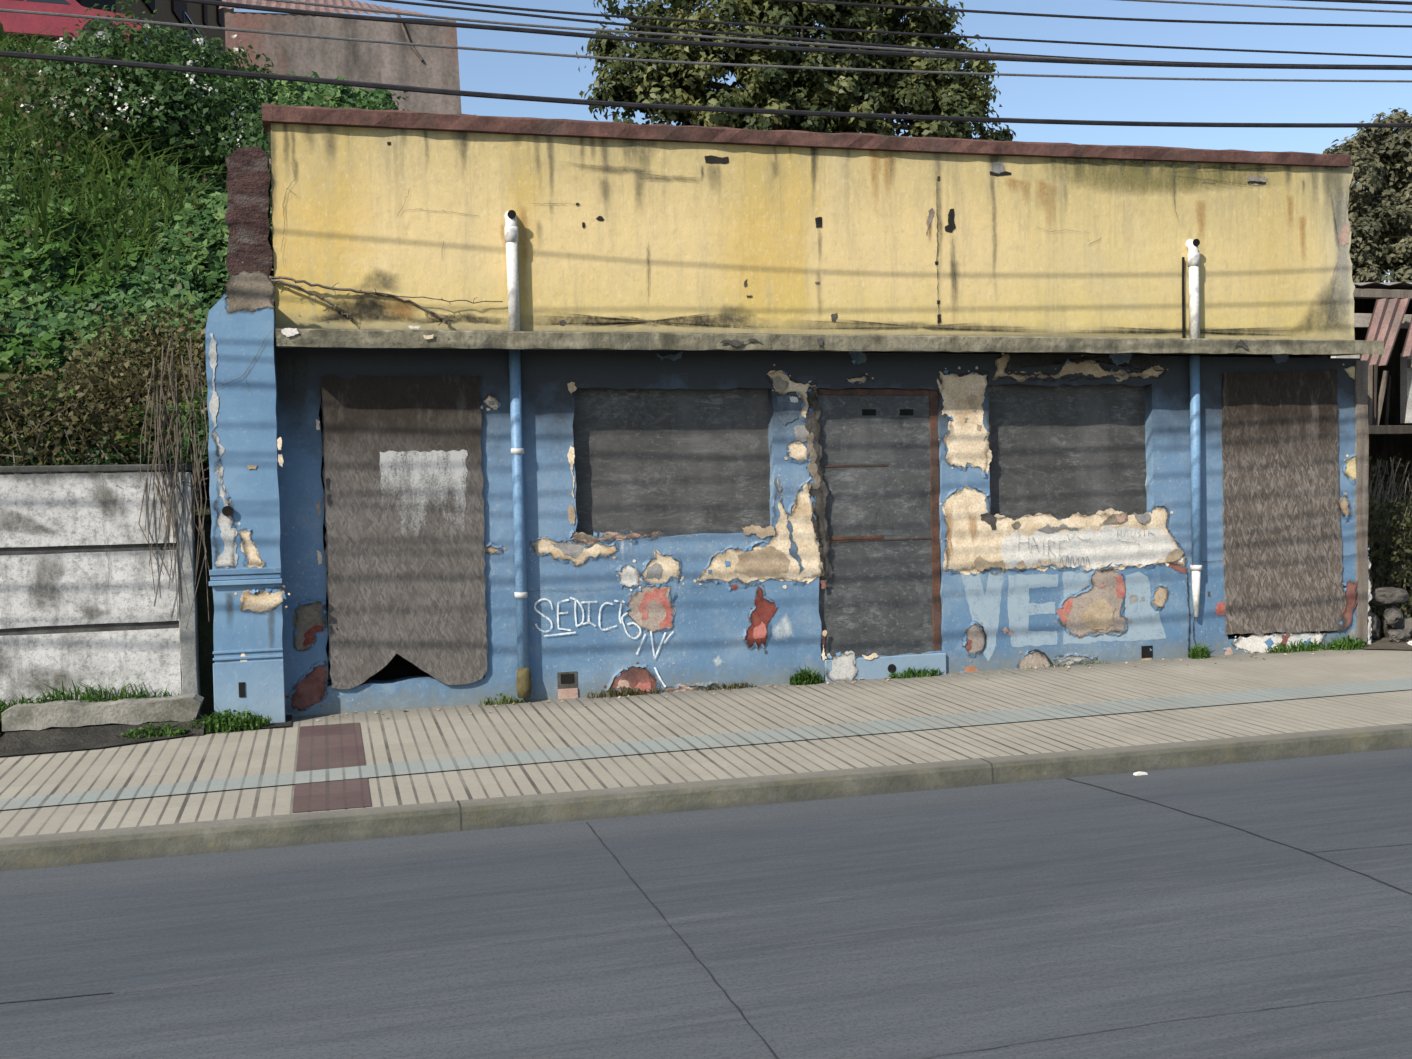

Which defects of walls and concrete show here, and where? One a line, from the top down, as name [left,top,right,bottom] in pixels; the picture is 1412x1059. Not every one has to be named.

leakage [1073,159,1242,189]
leakage [320,275,405,335]
leakage [432,315,492,323]
leakage [552,313,731,327]
peeling [209,333,265,568]
peeling [529,364,829,654]
peeling [936,352,1188,673]
flaking render [234,585,329,714]
flaking render [604,662,718,694]
peeling [1223,538,1372,655]